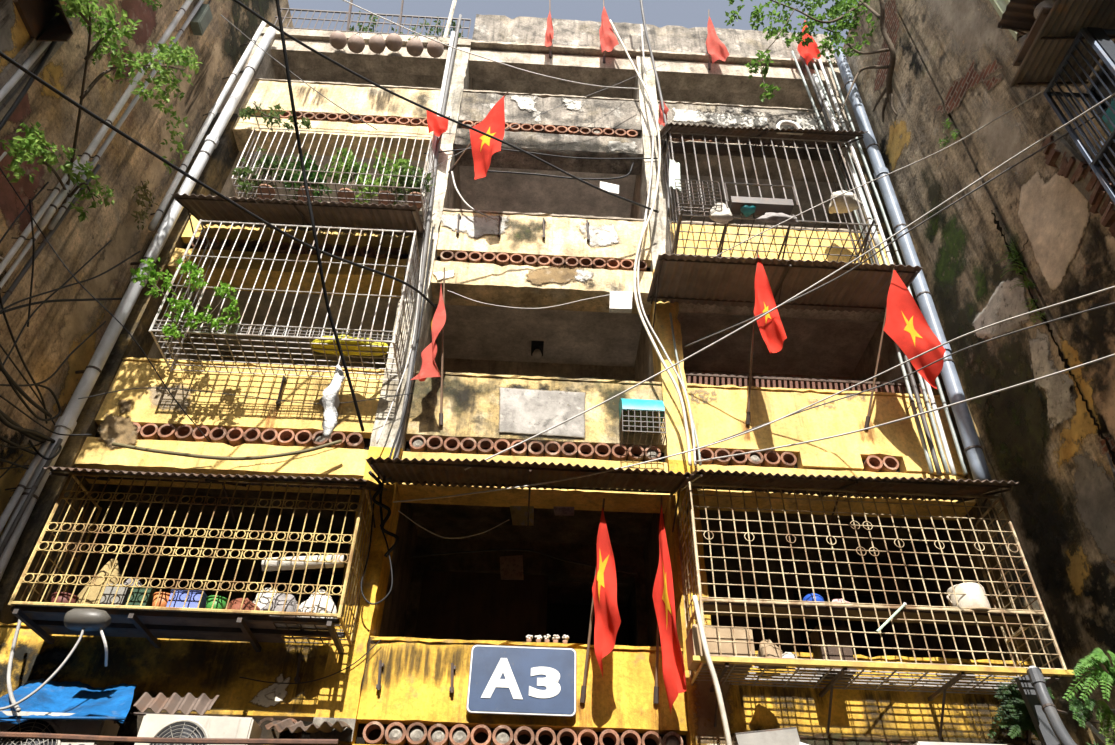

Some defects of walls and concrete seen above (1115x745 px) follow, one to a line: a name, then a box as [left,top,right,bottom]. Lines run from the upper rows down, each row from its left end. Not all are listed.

peeling [440,212,546,247]
peeling [577,221,620,248]
leakage [922,171,946,223]
peeling [976,104,1115,304]
peeling [433,270,455,281]
peeling [526,266,595,288]
leakage [981,245,1012,288]
peeling [972,277,1077,434]
crack [991,210,1115,465]
spalling [98,399,137,449]
leakage [933,281,1115,657]
leakage [361,636,462,687]